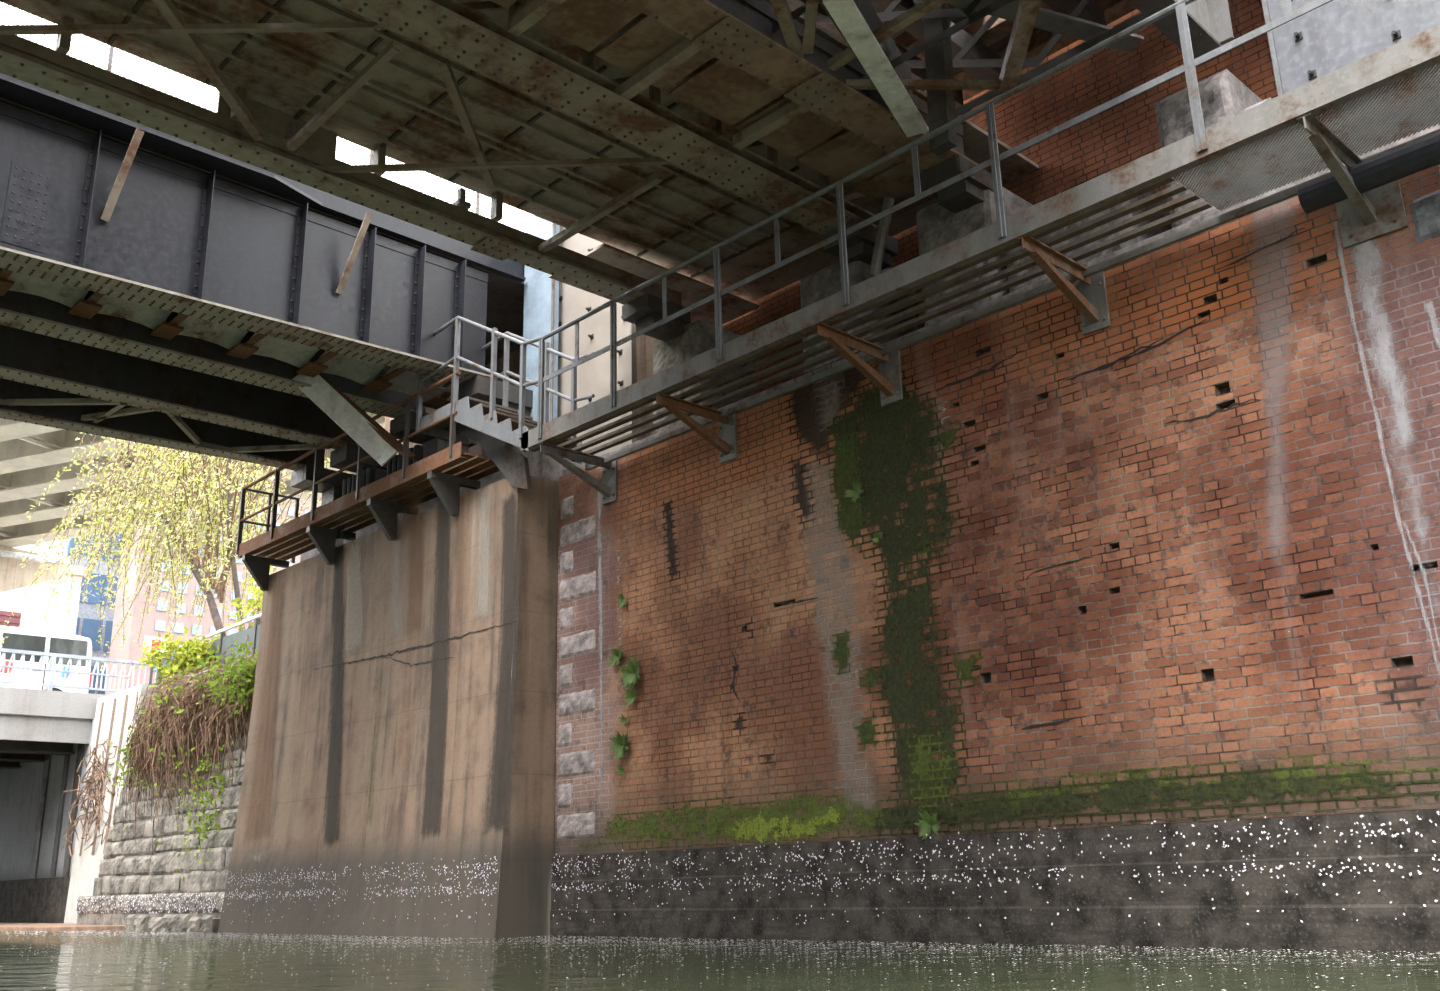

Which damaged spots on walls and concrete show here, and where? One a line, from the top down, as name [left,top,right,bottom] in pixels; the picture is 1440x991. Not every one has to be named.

leakage [1334,222,1440,663]
leakage [1376,666,1430,710]